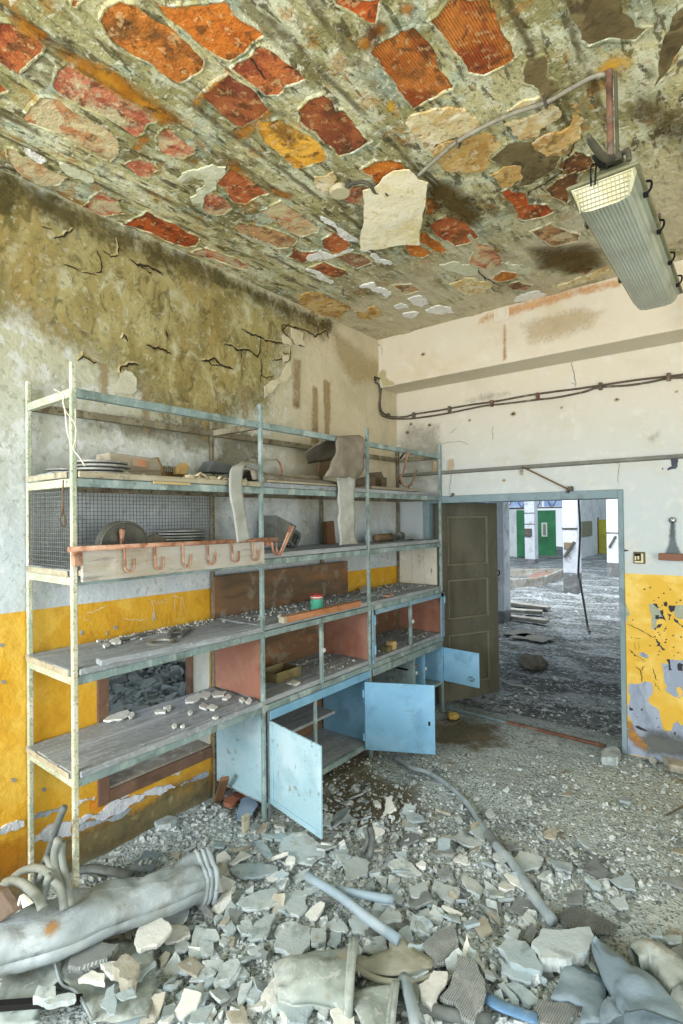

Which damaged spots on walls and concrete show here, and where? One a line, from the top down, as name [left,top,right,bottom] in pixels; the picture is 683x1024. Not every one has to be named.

spalling [553,0,683,96]
spalling [0,0,373,279]
spalling [332,0,595,248]
crack [41,224,164,276]
crack [76,330,172,373]
water stain [0,173,331,450]
crack [199,289,344,383]
peeling [298,291,381,320]
spalling [403,196,534,296]
peeling [556,267,613,290]
peeling [627,587,683,762]
peeling [0,771,209,842]